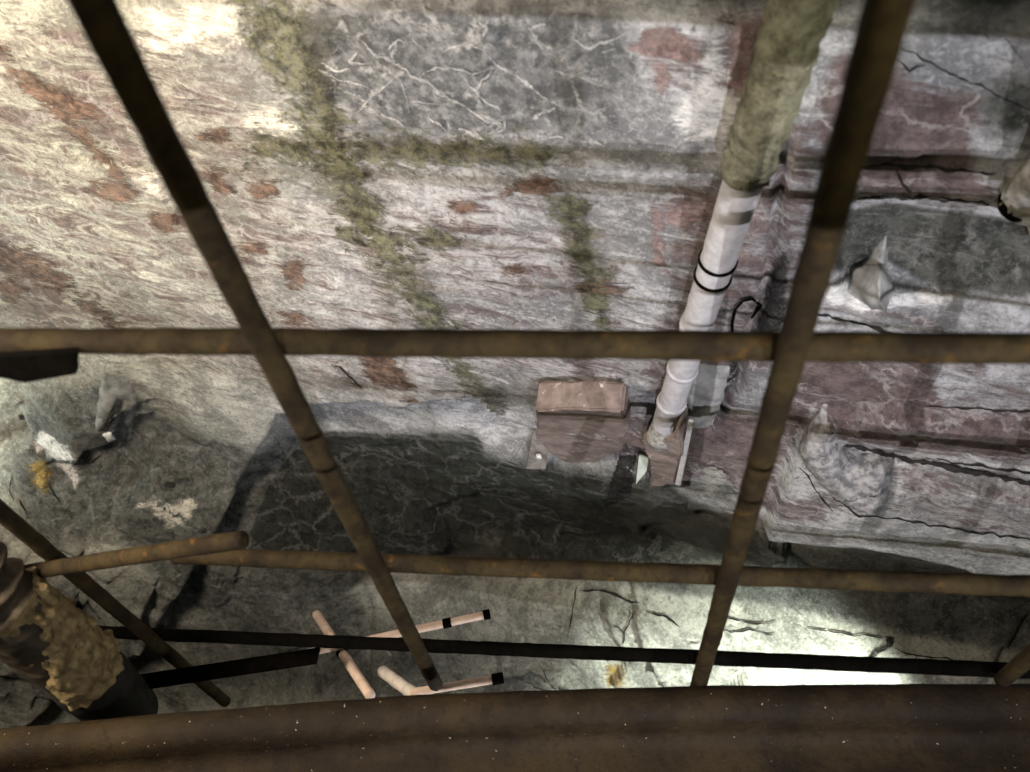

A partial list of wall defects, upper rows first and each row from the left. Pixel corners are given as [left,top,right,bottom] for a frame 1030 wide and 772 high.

corrosion [627,26,704,92]
crack [898,48,1030,111]
water stain [120,0,577,329]
water stain [541,190,618,330]
water stain [433,357,508,416]
crack [835,443,1030,486]
crack [800,468,1030,540]
crack [567,586,698,645]
crack [724,618,774,635]
crack [806,628,952,660]